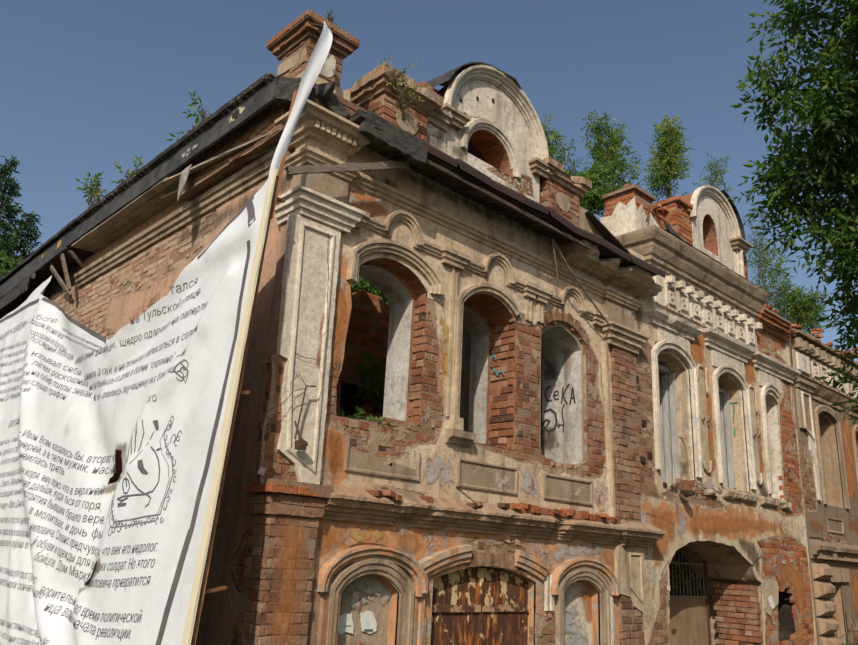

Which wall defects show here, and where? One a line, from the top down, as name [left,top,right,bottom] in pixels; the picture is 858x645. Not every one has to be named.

flaking render [327,298,454,503]
peeling [319,527,384,553]
flaking render [461,536,605,565]
flaking render [643,570,670,645]
flaking render [757,535,815,645]